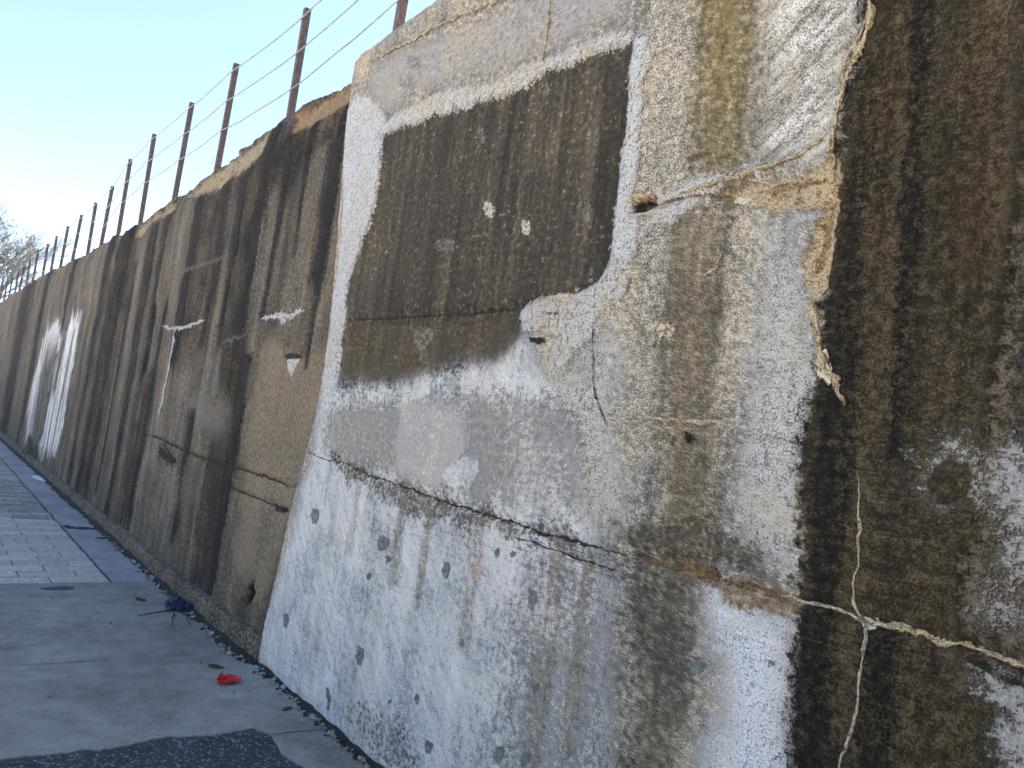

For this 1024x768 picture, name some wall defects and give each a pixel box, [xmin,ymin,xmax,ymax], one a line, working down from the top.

leakage [0,270,55,456]
leakage [60,257,81,328]
leakage [67,96,349,596]
peeling [258,36,658,768]
crack [592,328,607,425]
crack [307,450,1024,768]
leakage [616,213,725,768]
crack [657,0,877,206]
peeling [687,0,863,768]
leakage [781,0,1024,768]